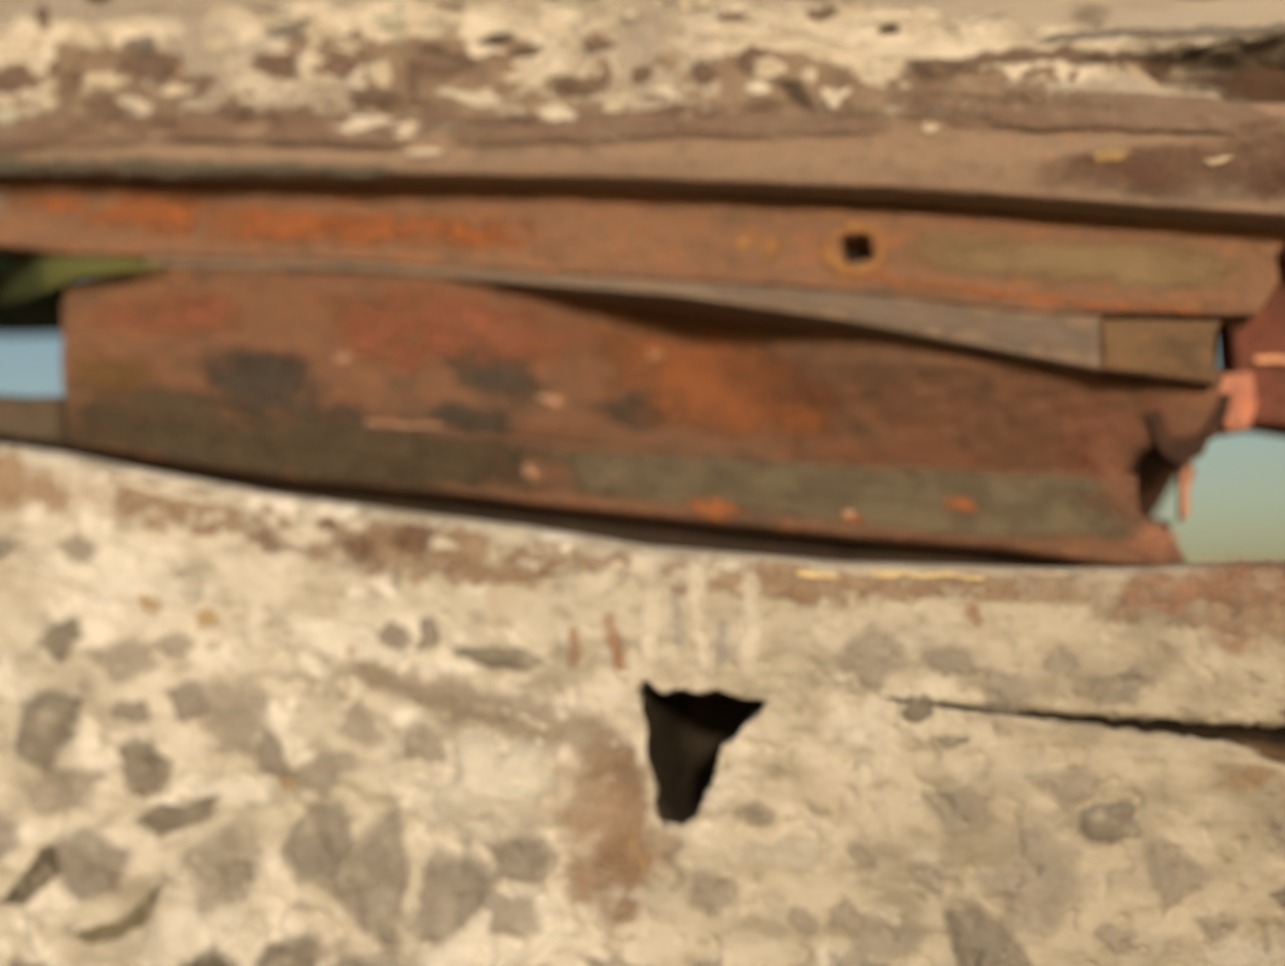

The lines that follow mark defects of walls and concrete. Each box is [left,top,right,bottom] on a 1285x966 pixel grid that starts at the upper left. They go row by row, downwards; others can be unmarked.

peeling [0,0,1285,157]
rust [820,220,886,278]
spalling [28,534,200,608]
spalling [36,618,80,661]
spalling [278,618,440,664]
spalling [457,646,540,672]
spalling [0,653,95,813]
crack [884,696,1285,762]
spalling [118,680,562,966]
spalling [0,835,127,915]
spalling [75,835,258,966]
spalling [946,907,1030,966]